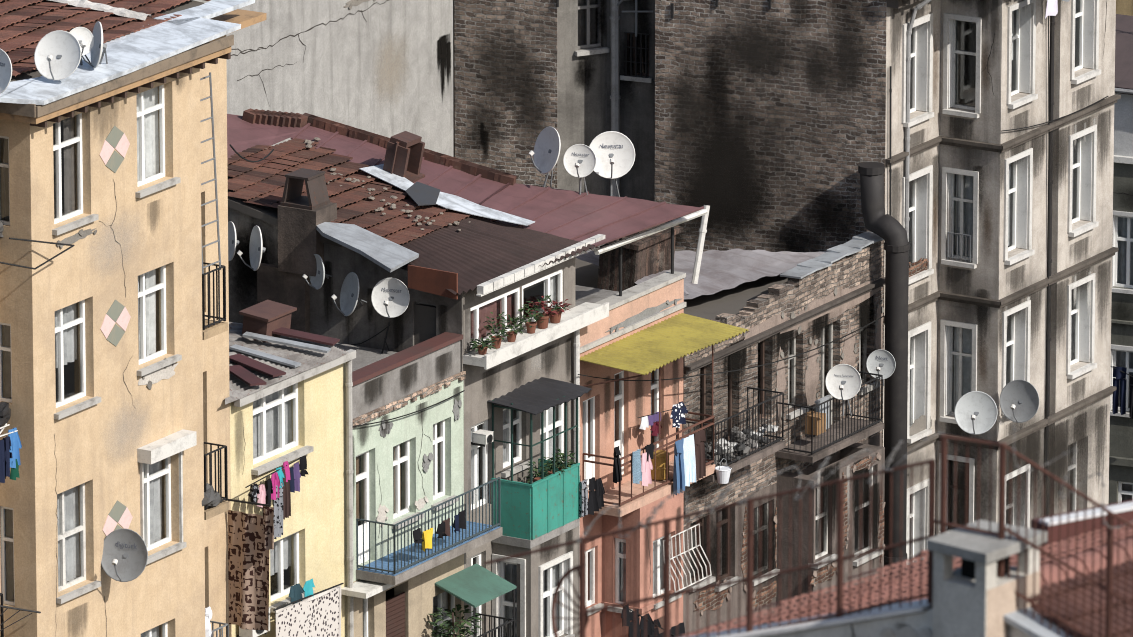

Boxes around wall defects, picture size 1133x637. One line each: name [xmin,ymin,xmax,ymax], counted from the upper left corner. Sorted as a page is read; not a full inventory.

crack [231,0,389,106]
leakage [437,39,451,98]
leakage [576,59,593,86]
leakage [676,27,791,134]
leakage [893,7,924,52]
leakage [1000,137,1043,183]
leakage [1057,112,1110,173]
leakage [665,147,763,246]
leakage [774,198,851,252]
leakage [934,156,949,226]
leakage [947,267,1038,340]
leakage [948,423,964,436]